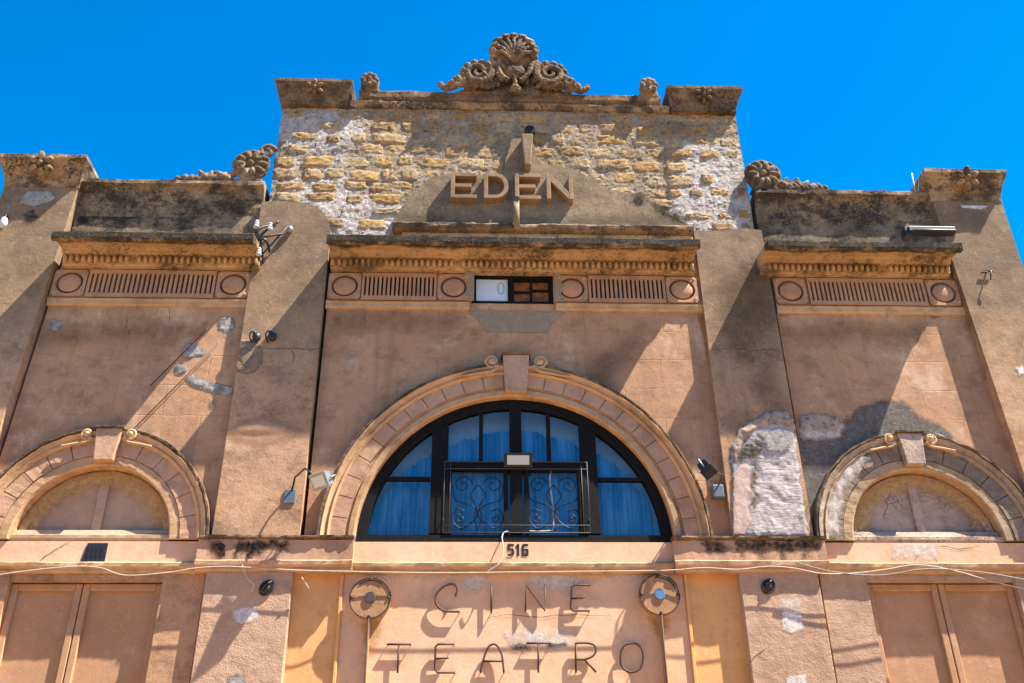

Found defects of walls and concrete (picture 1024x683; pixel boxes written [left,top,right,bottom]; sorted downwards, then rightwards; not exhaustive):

peeling [730,399,959,535]
water stain [210,540,288,559]
water stain [702,541,820,560]